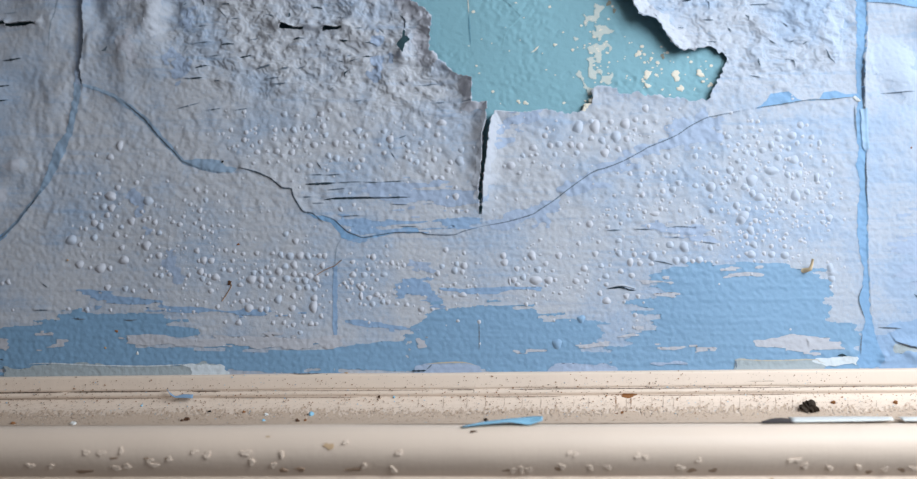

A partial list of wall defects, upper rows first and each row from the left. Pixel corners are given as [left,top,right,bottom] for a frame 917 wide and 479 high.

crack [0,0,738,335]
peeling [394,0,727,214]
crack [443,0,917,408]
crack [0,359,167,400]
crack [242,390,392,398]